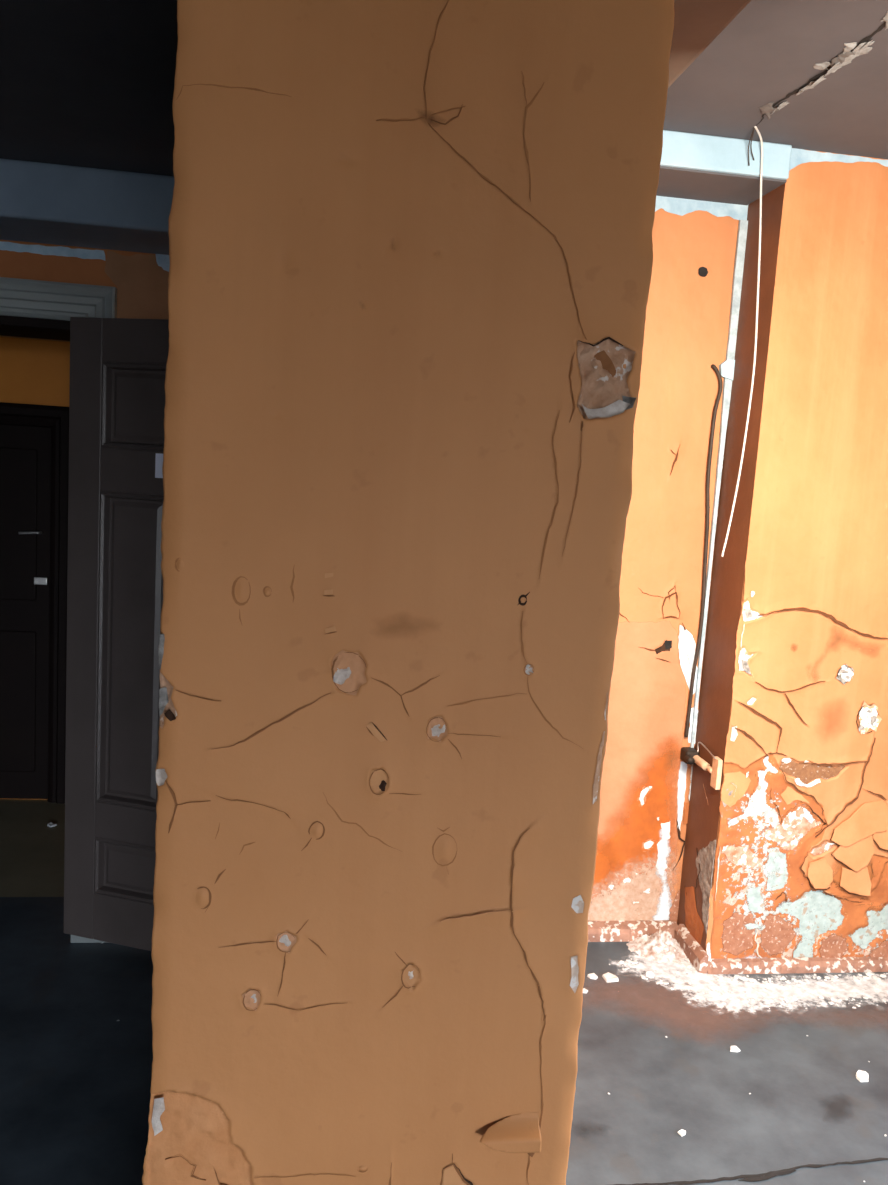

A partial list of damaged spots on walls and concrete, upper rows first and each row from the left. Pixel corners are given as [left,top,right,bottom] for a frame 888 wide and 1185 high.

crack [756,11,888,126]
flaking render [429,124,636,431]
peeling [593,150,888,975]
crack [758,607,888,639]
flaking render [215,650,440,749]
crack [736,681,825,756]
crack [815,738,886,837]
crack [441,828,545,1021]
flaking render [571,895,584,913]
flaking render [570,956,598,993]
peeling [146,1091,253,1185]
crack [613,1158,888,1185]